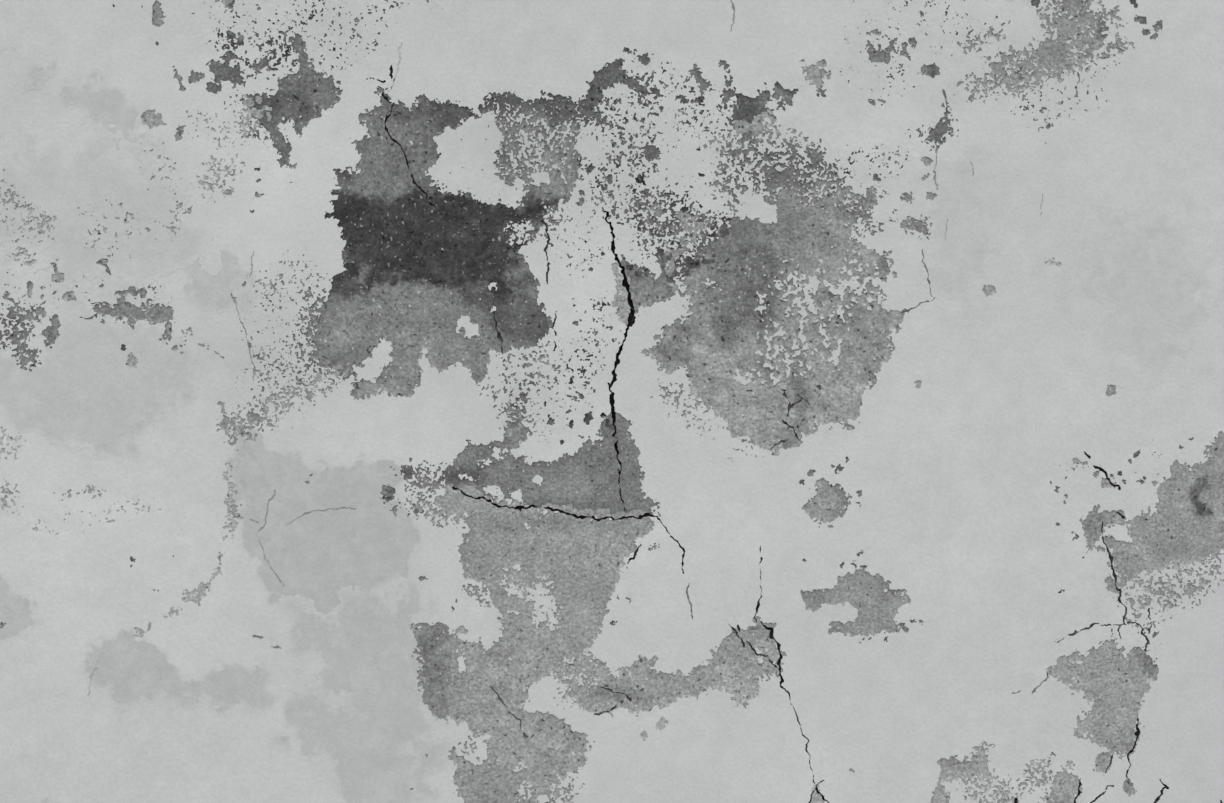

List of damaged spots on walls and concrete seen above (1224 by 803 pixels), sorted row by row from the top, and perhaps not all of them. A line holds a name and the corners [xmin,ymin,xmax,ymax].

peeling [173,31,343,168]
damp [324,179,570,346]
peeling [333,47,666,239]
peeling [610,0,1163,461]
peeling [133,284,539,637]
crack [452,211,693,619]
peeling [390,395,786,803]
crack [729,546,829,803]
crack [1055,451,1152,652]
crack [1074,718,1140,803]
peeling [1072,431,1224,630]
crack [1154,779,1169,803]